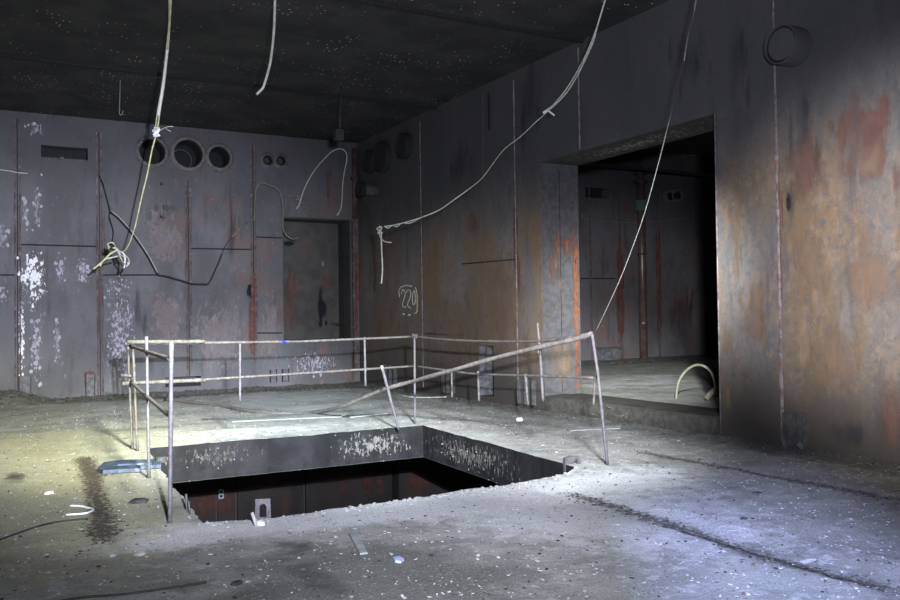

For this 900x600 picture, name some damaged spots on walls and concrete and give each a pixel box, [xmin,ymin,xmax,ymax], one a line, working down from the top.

peeling [16,252,90,387]
peeling [104,275,136,384]